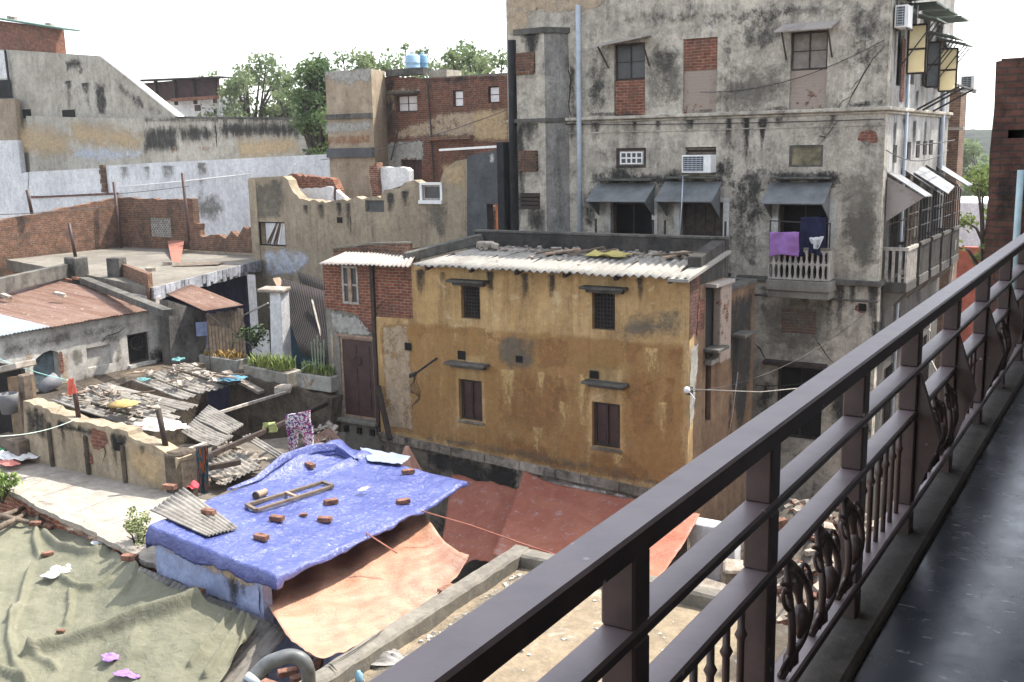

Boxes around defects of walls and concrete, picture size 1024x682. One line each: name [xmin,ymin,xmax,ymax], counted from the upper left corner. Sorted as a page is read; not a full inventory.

damp [65,60,106,113]
damp [121,88,298,151]
flaking render [857,130,878,143]
damp [584,159,876,266]
peeling [360,274,705,483]
flaking render [83,428,108,464]